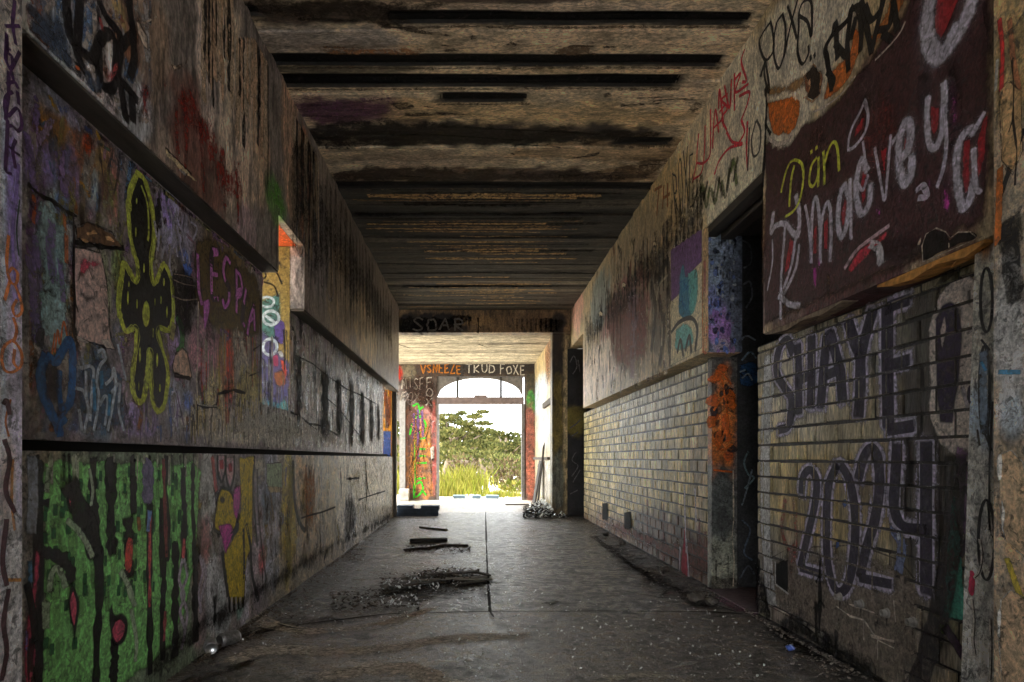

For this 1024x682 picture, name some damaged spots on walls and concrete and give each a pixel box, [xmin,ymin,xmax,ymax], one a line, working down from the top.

leakage [280,96,667,363]
leakage [585,174,704,363]